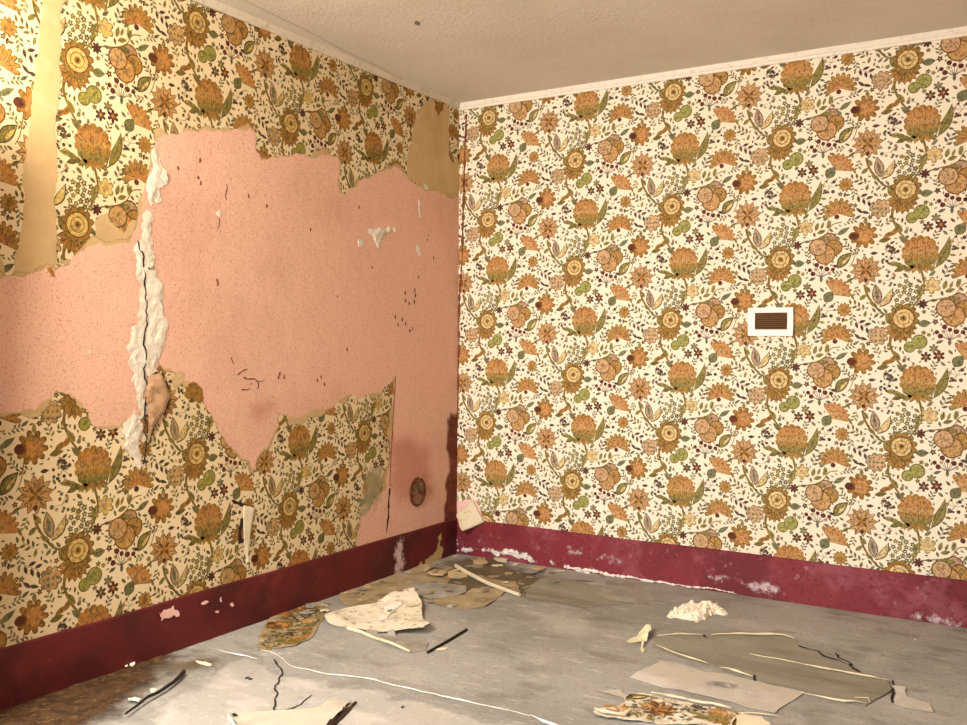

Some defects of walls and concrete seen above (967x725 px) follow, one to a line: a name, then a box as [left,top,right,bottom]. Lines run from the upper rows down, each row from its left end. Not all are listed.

flaking render [357,226,396,248]
flaking render [123,148,180,470]
crack [137,241,154,467]
crack [273,659,311,710]
crack [889,680,897,703]